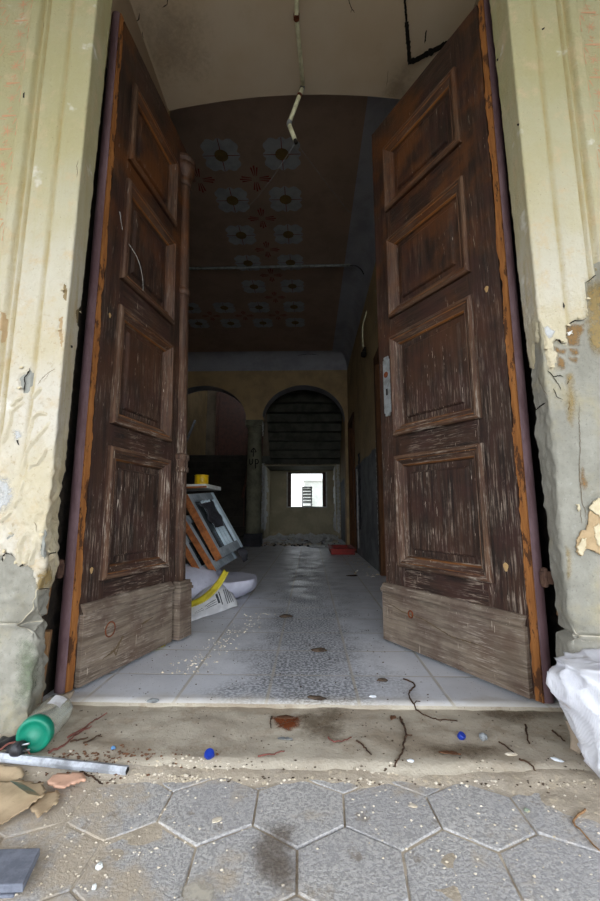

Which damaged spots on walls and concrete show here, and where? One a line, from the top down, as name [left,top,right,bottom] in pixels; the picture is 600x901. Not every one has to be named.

flaking render [17,366,34,393]
flaking render [531,262,600,658]
flaking render [0,529,50,734]